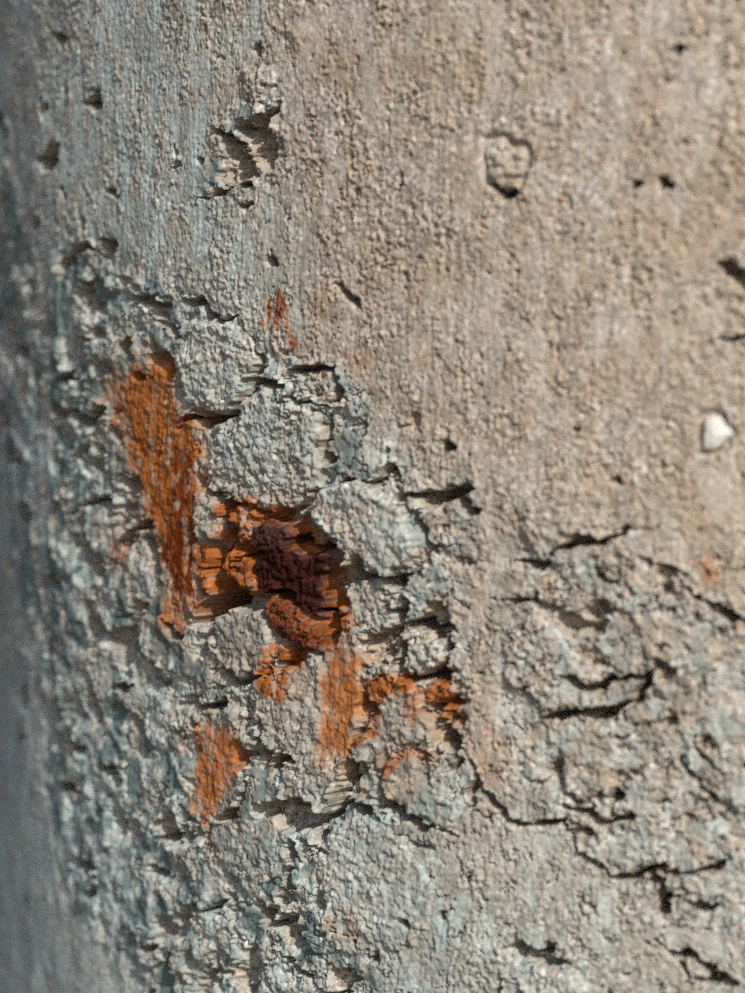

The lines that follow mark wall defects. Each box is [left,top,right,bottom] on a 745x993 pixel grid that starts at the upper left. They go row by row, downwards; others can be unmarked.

spalling [0,95,47,663]
corrosion [178,700,259,849]
corrosion [83,317,519,797]
spalling [35,230,745,993]
crack [132,289,745,993]